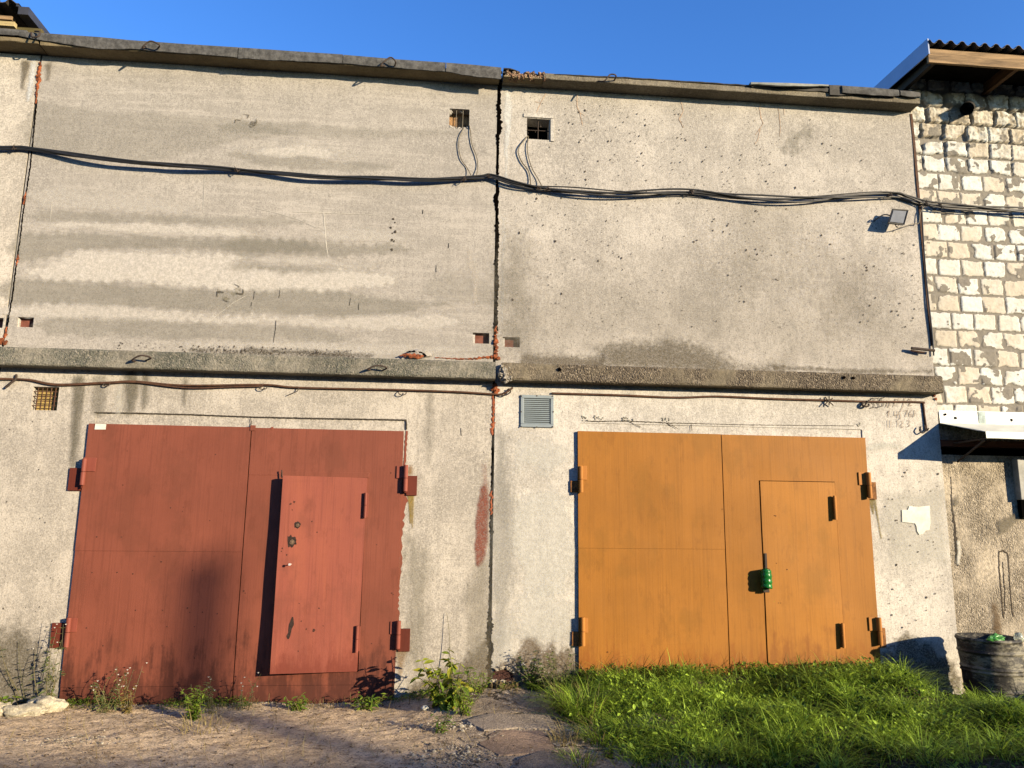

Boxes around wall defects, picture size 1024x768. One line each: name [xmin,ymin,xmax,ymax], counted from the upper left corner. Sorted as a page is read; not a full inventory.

spalling [505,70,546,84]
crack [493,71,503,331]
water stain [522,339,833,371]
water stain [117,371,147,411]
crack [485,441,494,682]